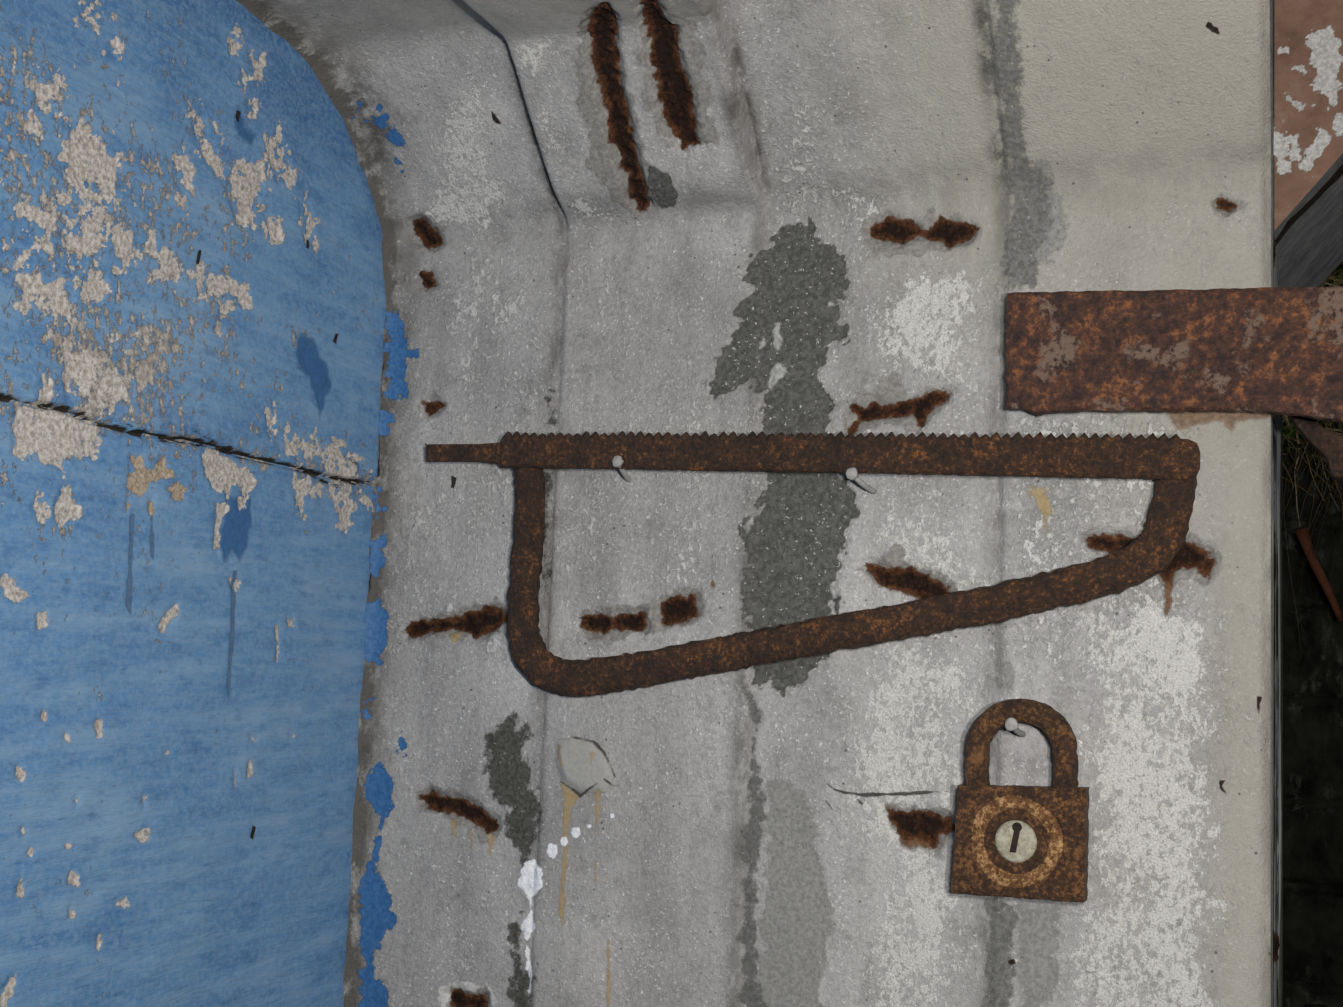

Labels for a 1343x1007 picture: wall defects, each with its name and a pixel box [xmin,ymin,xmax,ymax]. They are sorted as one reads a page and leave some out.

peeling [72,0,132,61]
peeling [171,23,321,260]
damp [989,0,1065,288]
peeling [1274,25,1343,175]
peeling [2,63,253,528]
crack [0,393,380,488]
peeling [202,447,257,550]
peeling [264,401,374,534]
peeling [0,573,30,603]
damp [483,713,591,1007]
peeling [0,975,16,1007]
damp [983,899,1060,1007]